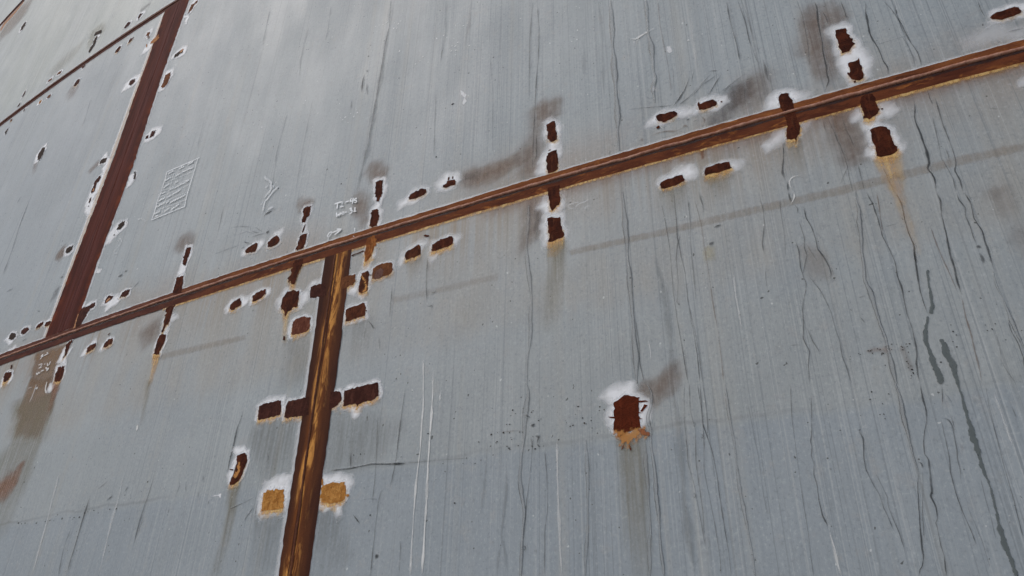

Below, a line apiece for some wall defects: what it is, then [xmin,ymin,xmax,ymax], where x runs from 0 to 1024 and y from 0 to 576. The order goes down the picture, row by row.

rust [0,110,810,576]
rust [0,0,1024,357]